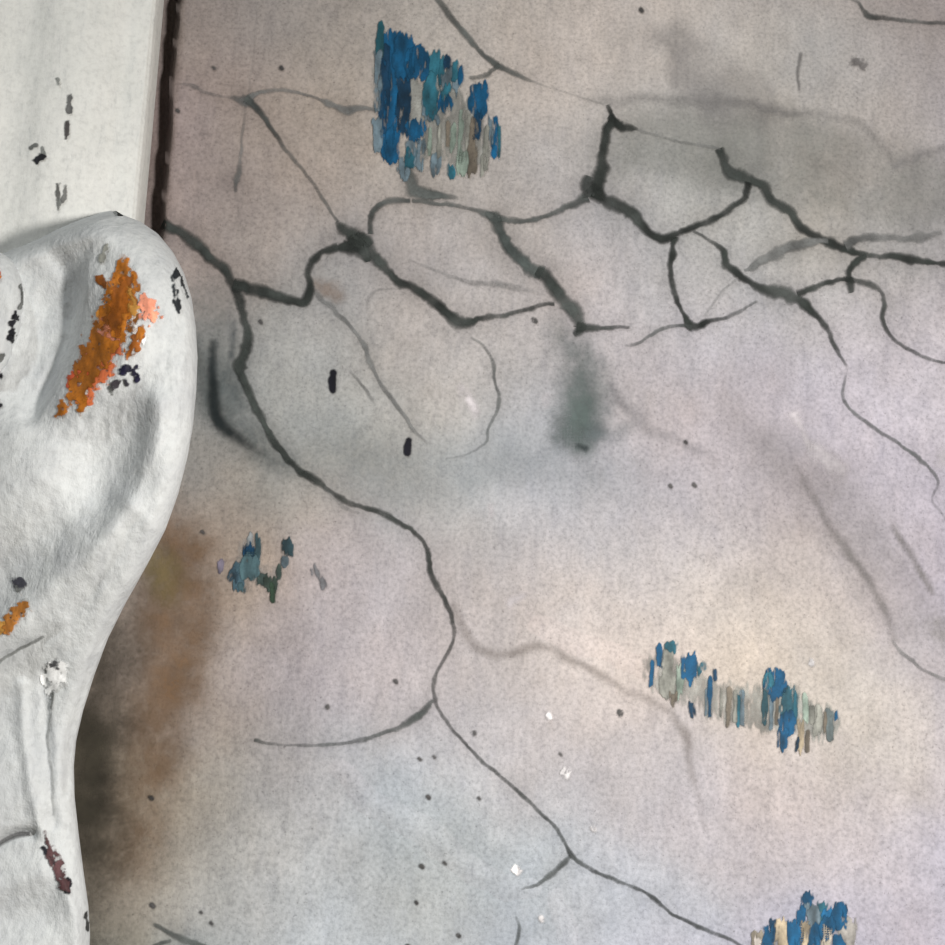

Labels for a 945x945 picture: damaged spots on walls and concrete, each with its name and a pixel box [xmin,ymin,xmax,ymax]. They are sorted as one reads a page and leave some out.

crack [436,0,525,79]
crack [860,4,937,24]
crack [234,90,281,141]
crack [298,92,375,114]
peeling [372,21,501,181]
crack [160,105,945,741]
peeling [217,531,294,603]
peeling [648,640,840,756]
crack [453,730,740,945]
crack [154,924,204,945]
peeling [751,890,857,945]